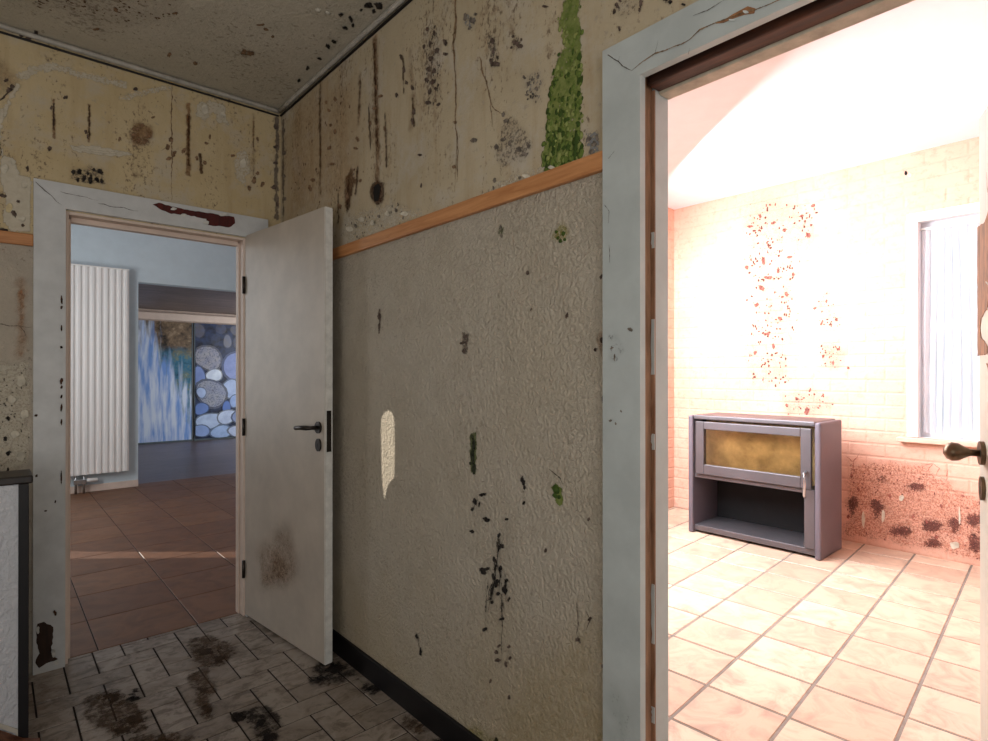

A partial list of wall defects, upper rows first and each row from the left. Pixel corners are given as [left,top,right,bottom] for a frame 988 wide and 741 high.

leakage [339,3,383,30]
leakage [423,25,448,106]
leakage [488,36,499,67]
crack [608,0,779,70]
leakage [74,116,155,154]
leakage [494,112,530,167]
peeling [153,203,235,227]
leakage [336,167,364,222]
leakage [744,203,818,387]
leakage [479,533,512,667]
peeling [35,610,59,668]